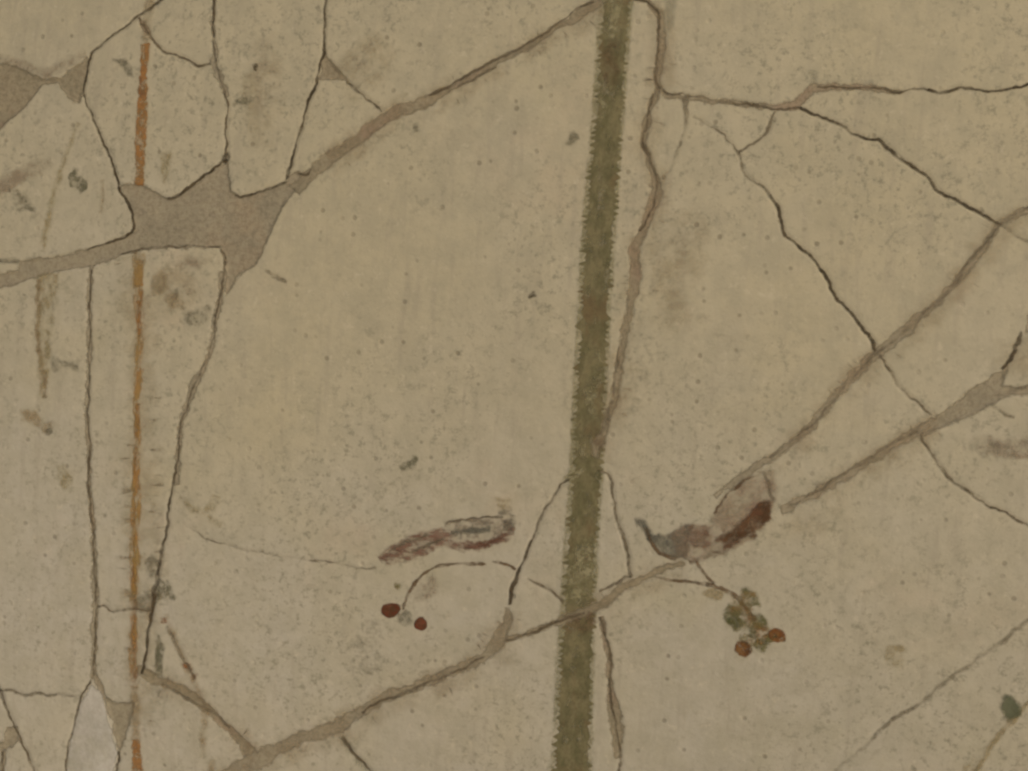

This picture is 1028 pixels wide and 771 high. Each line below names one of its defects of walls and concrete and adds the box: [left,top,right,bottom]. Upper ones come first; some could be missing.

crack [236,0,380,198]
crack [429,1,594,96]
crack [638,0,1028,372]
crack [0,0,229,771]
crack [911,399,1024,523]
crack [599,470,632,591]
crack [342,737,370,770]
crack [362,697,396,713]
crack [507,613,624,771]
crack [873,697,927,739]